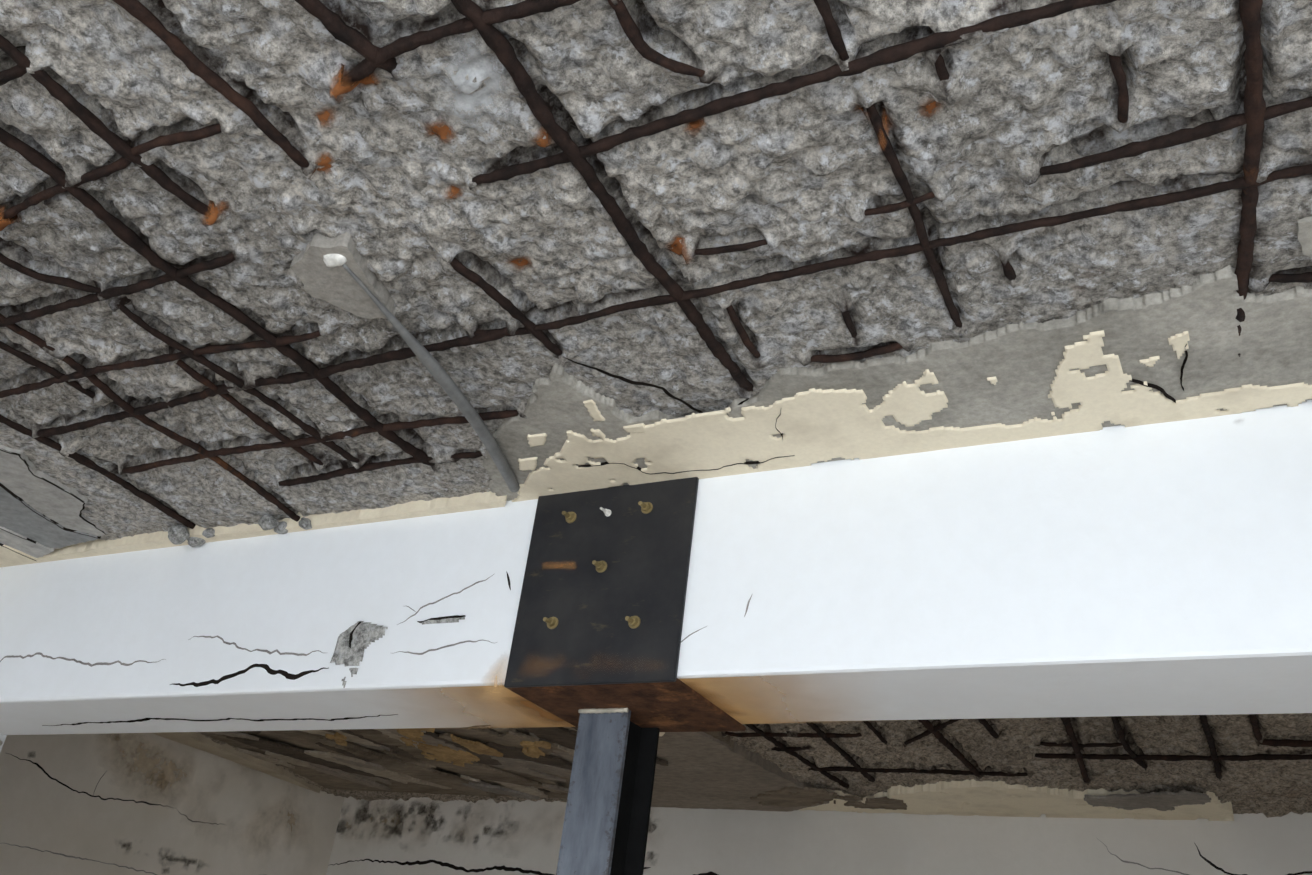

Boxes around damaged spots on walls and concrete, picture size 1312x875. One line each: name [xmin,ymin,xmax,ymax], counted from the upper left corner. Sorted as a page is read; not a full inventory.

corrosion [316,64,378,125]
corrosion [668,236,688,263]
spalling [0,0,1312,567]
crack [395,571,511,655]
crack [0,635,328,687]
spalling [330,621,388,688]
crack [42,714,398,726]
corrosion [679,676,789,724]
flaking render [152,727,578,803]
spalling [651,713,1312,821]
leakage [387,805,443,835]
crack [330,859,554,875]